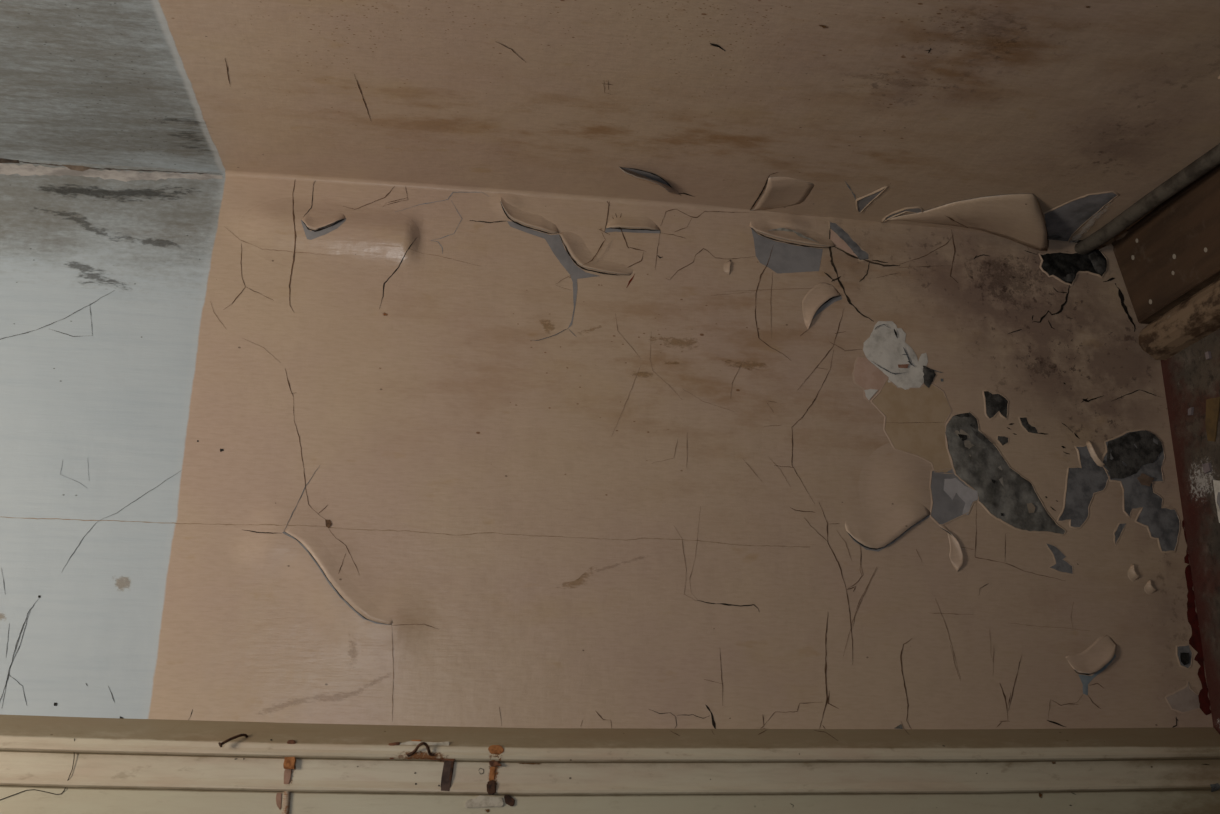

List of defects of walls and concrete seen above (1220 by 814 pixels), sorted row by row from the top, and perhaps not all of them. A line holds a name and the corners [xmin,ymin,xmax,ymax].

crack [2,158,216,174]
peeling [619,167,681,197]
peeling [605,216,660,233]
peeling [750,177,870,329]
peeling [881,191,1119,286]
crack [1032,285,1070,329]
crack [1103,278,1136,332]
crack [0,172,968,741]
flaking render [845,356,1181,575]
crack [933,502,1088,727]
crack [1047,683,1102,727]